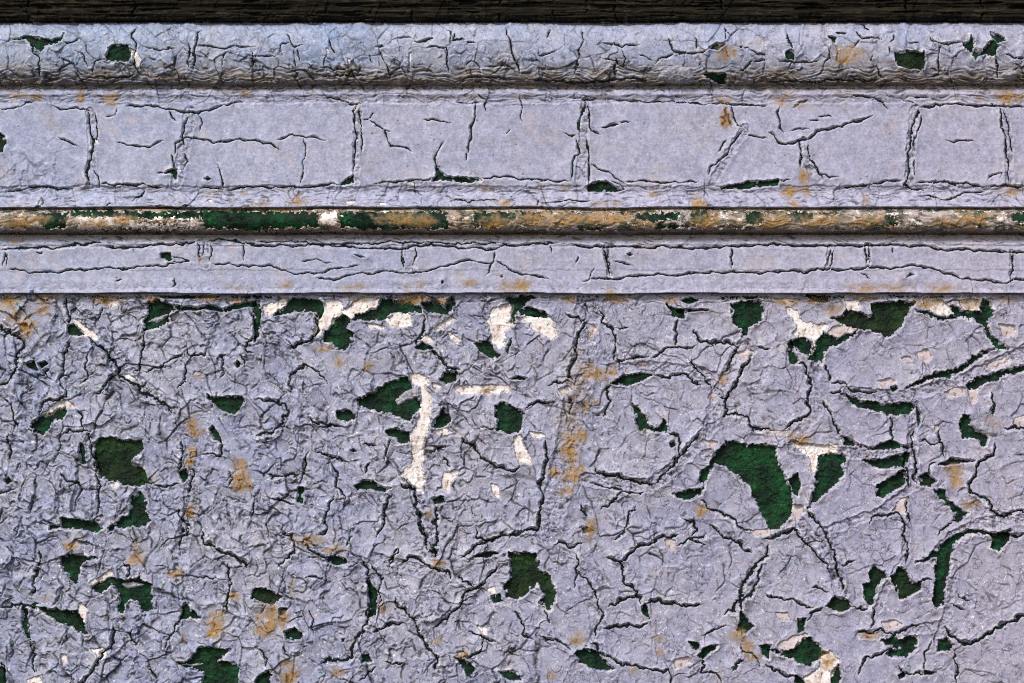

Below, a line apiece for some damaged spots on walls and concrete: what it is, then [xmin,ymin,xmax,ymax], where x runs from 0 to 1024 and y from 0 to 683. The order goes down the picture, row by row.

crack [2,25,1024,209]
peeling [50,437,152,533]
crack [0,298,259,517]
peeling [79,295,460,350]
peeling [336,371,545,504]
crack [2,238,1024,417]
crack [251,418,1024,683]
crack [653,321,877,434]
peeling [672,431,909,536]
peeling [721,294,1024,447]
peeling [862,473,1010,608]
crack [968,392,1024,538]